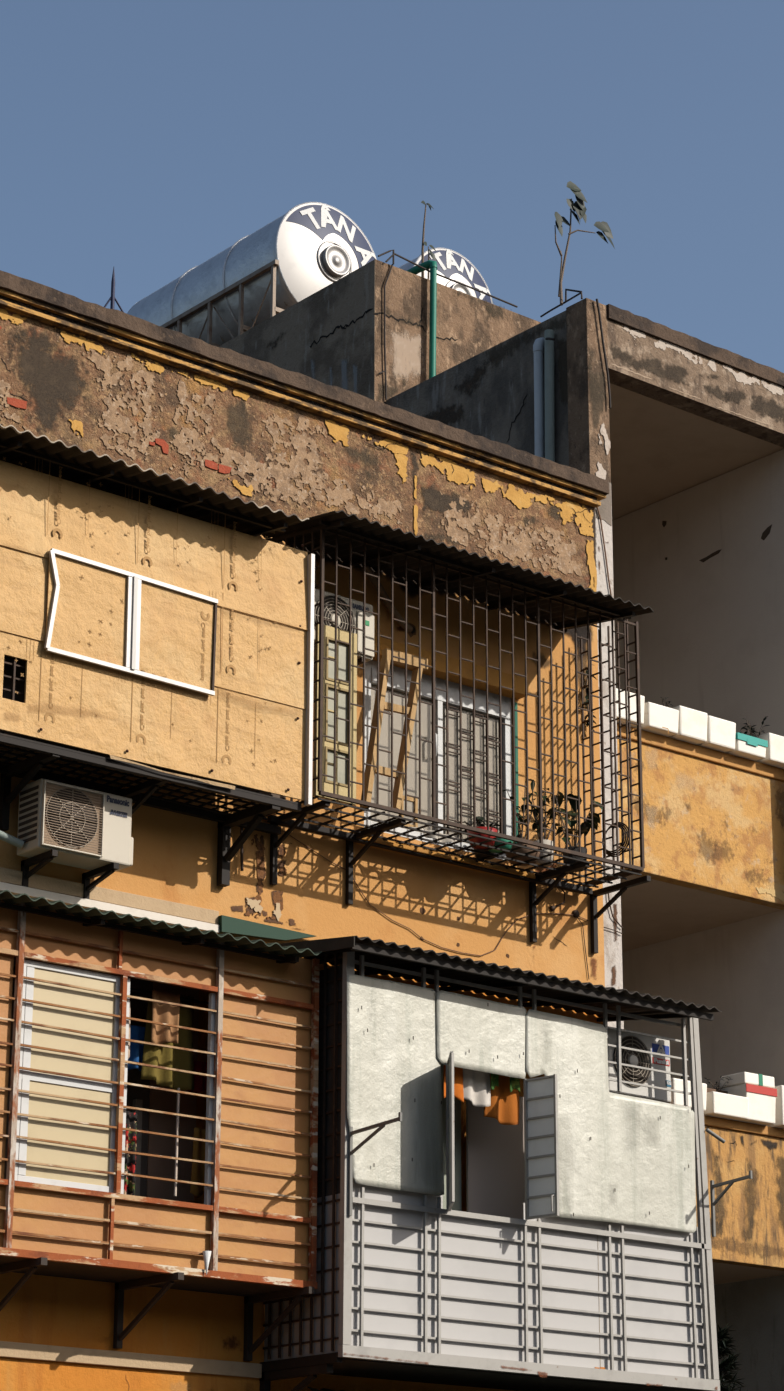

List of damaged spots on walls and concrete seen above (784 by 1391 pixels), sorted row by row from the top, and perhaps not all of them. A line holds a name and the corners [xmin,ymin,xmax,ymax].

peeling [0,308,27,343]
flaking render [0,372,27,430]
damp [9,327,89,432]
crack [310,307,458,348]
peeling [622,325,784,395]
flaking render [54,327,597,592]
peeling [595,423,611,479]
flaking render [244,834,296,924]
damp [697,1156,725,1234]
damp [744,1163,757,1239]
damp [741,1136,784,1225]